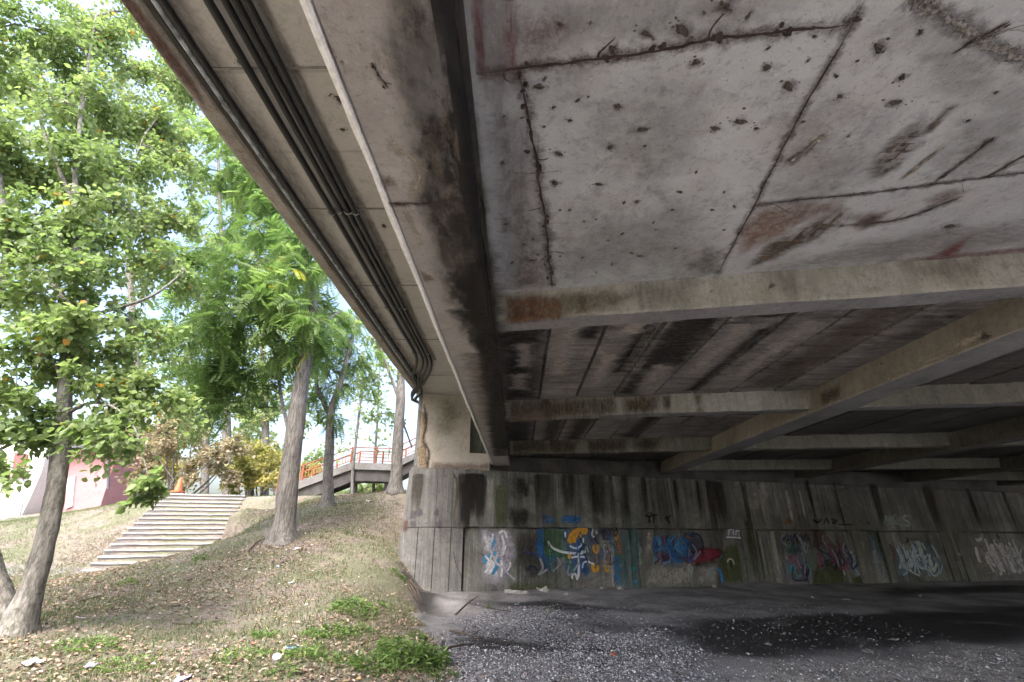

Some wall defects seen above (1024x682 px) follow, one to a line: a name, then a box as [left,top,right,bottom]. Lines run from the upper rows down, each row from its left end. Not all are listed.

crack [477,0,1024,286]
corrosion [508,296,563,322]
water stain [387,0,757,532]
water stain [720,320,825,382]
water stain [509,475,574,576]